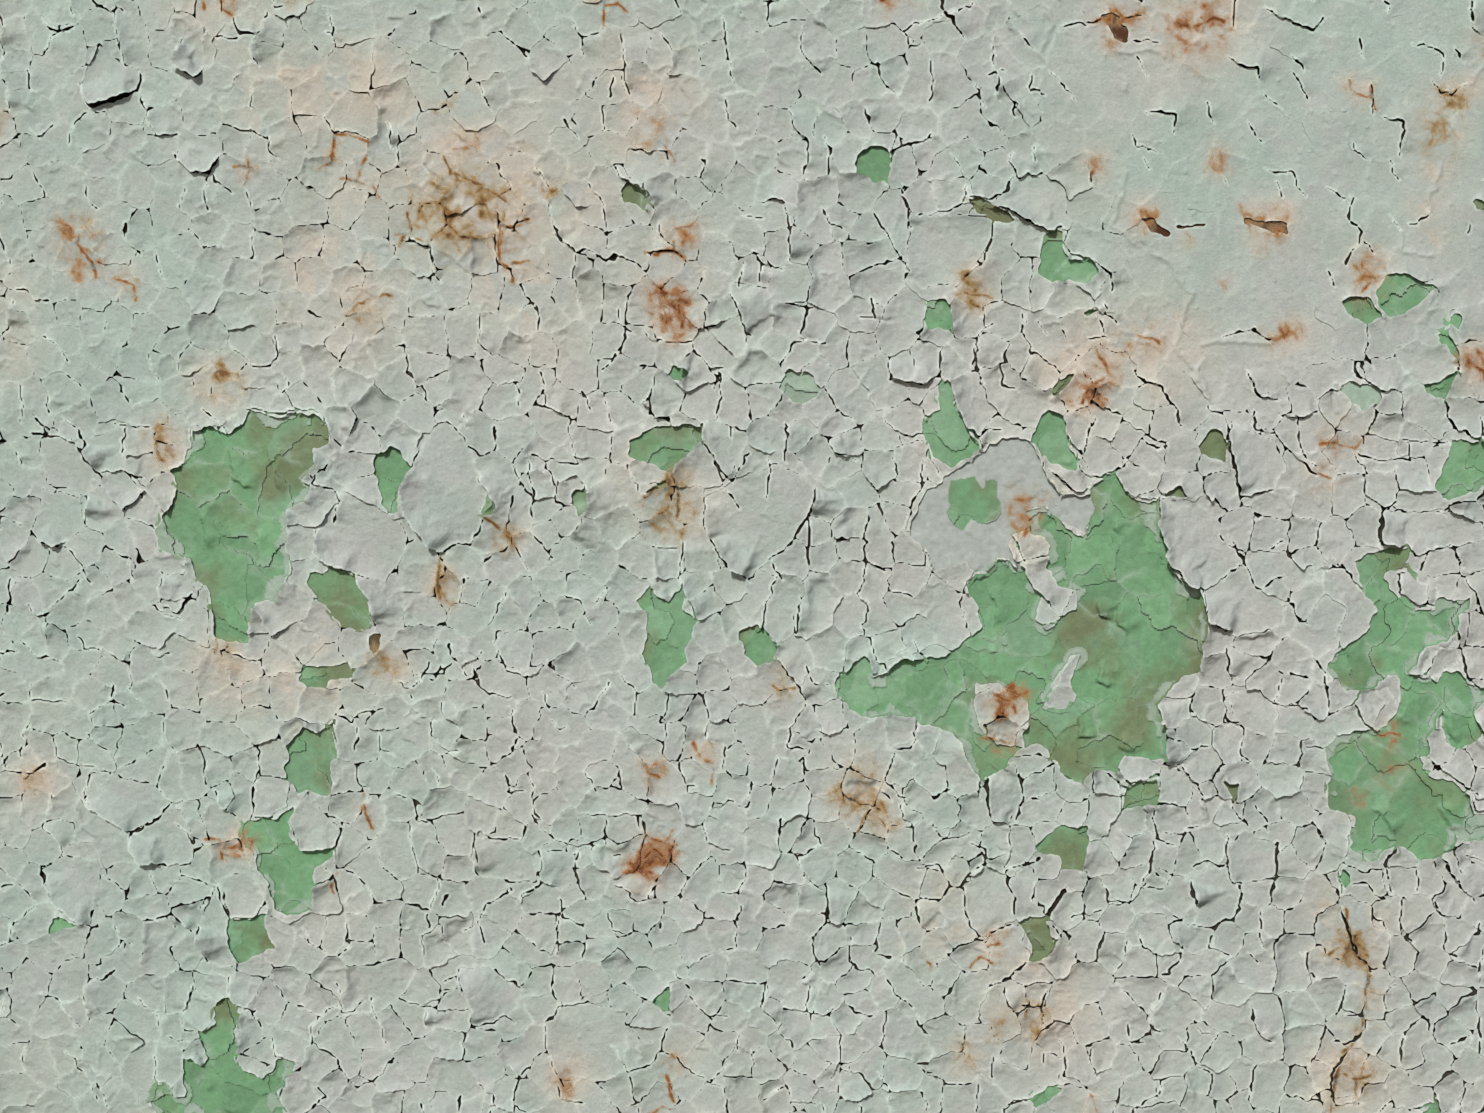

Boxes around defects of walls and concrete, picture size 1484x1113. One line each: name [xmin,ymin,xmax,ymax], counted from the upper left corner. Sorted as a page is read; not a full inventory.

corrosion [1167,3,1232,53]
crack [85,73,142,108]
corrosion [396,138,530,283]
crack [965,177,1114,291]
crack [678,488,816,610]
crack [1355,453,1484,616]
peeling [0,170,1337,1113]
corrosion [985,683,1030,753]
peeling [1151,273,1484,1056]
corrosion [622,830,679,880]
corrosion [828,768,895,833]
crack [1004,857,1067,916]